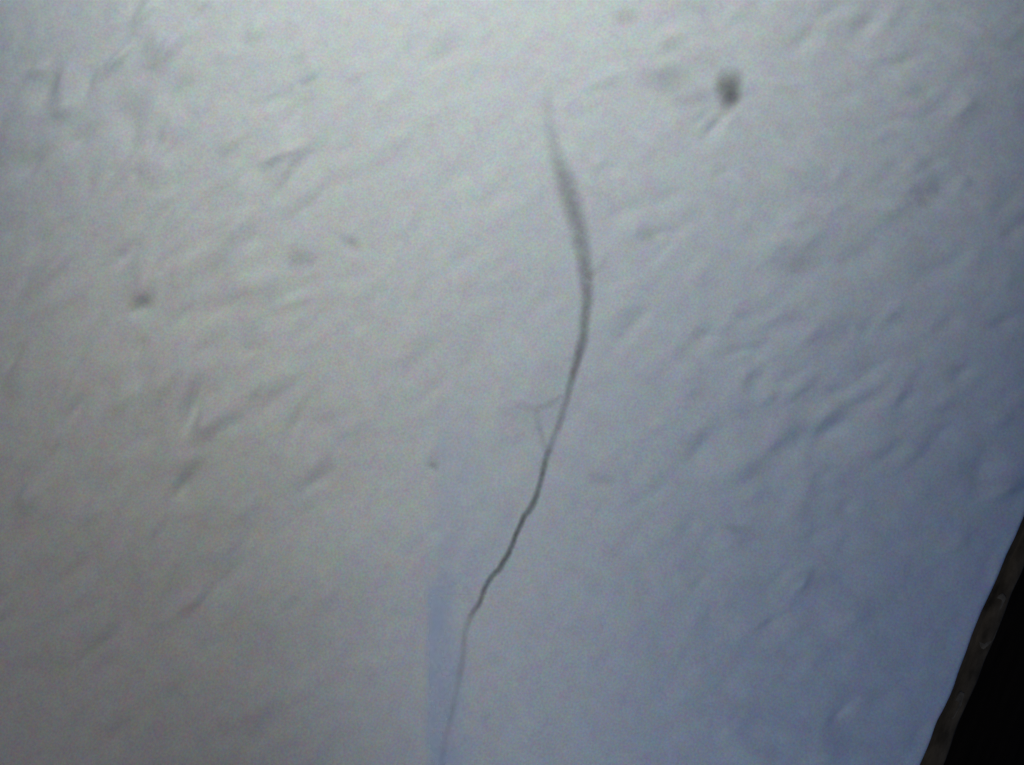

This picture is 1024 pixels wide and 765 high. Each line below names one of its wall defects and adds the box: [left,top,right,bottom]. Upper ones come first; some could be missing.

crack [563,131,603,220]